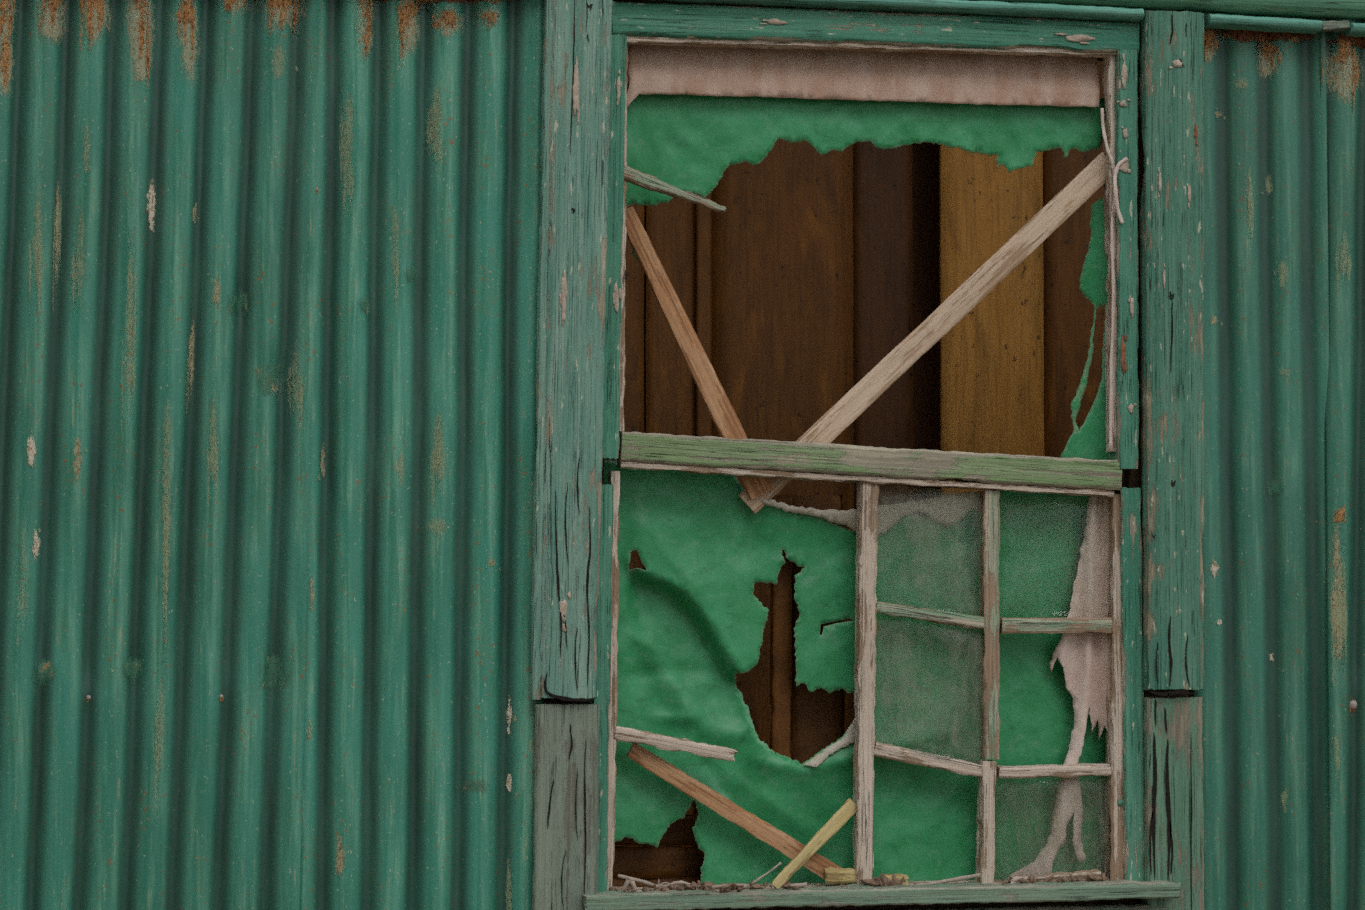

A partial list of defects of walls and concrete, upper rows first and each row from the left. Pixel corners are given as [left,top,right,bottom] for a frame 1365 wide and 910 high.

corrosion [0,0,15,95]
corrosion [38,0,112,50]
corrosion [127,0,155,84]
corrosion [173,0,201,89]
corrosion [220,0,305,35]
corrosion [357,0,511,64]
peeling [572,58,580,124]
corrosion [1204,28,1365,113]
peeling [560,270,568,326]
crack [544,422,597,910]
crack [1149,617,1196,910]